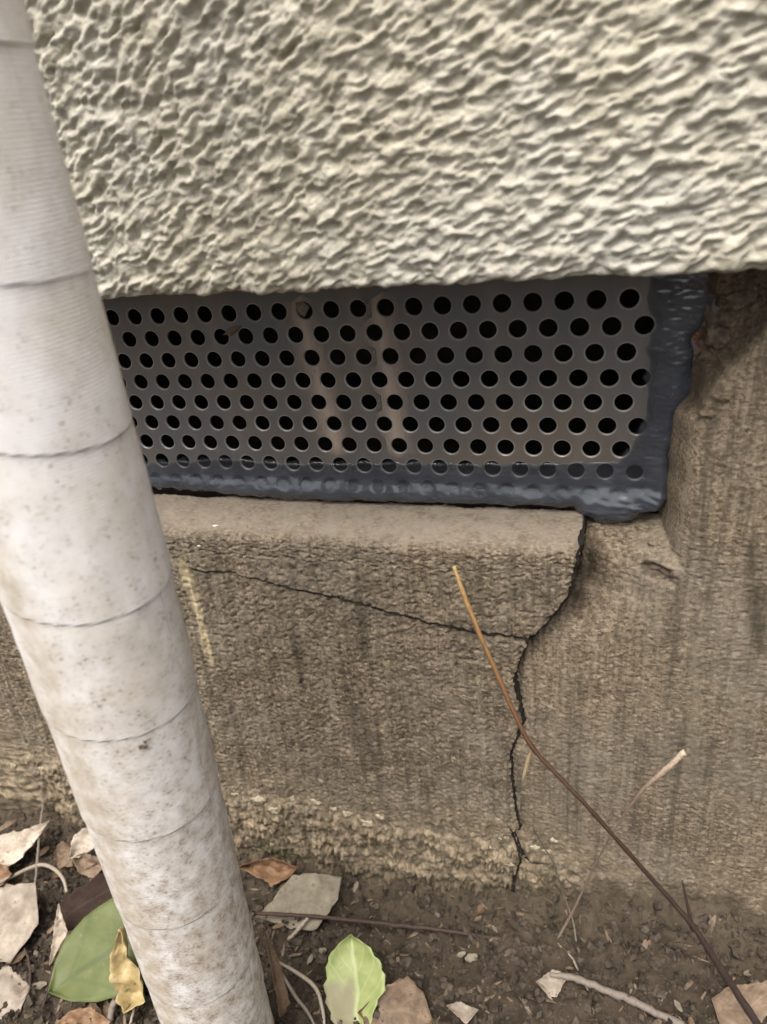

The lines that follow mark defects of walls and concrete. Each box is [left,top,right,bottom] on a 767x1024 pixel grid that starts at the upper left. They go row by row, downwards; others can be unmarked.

crack [188,516,587,892]